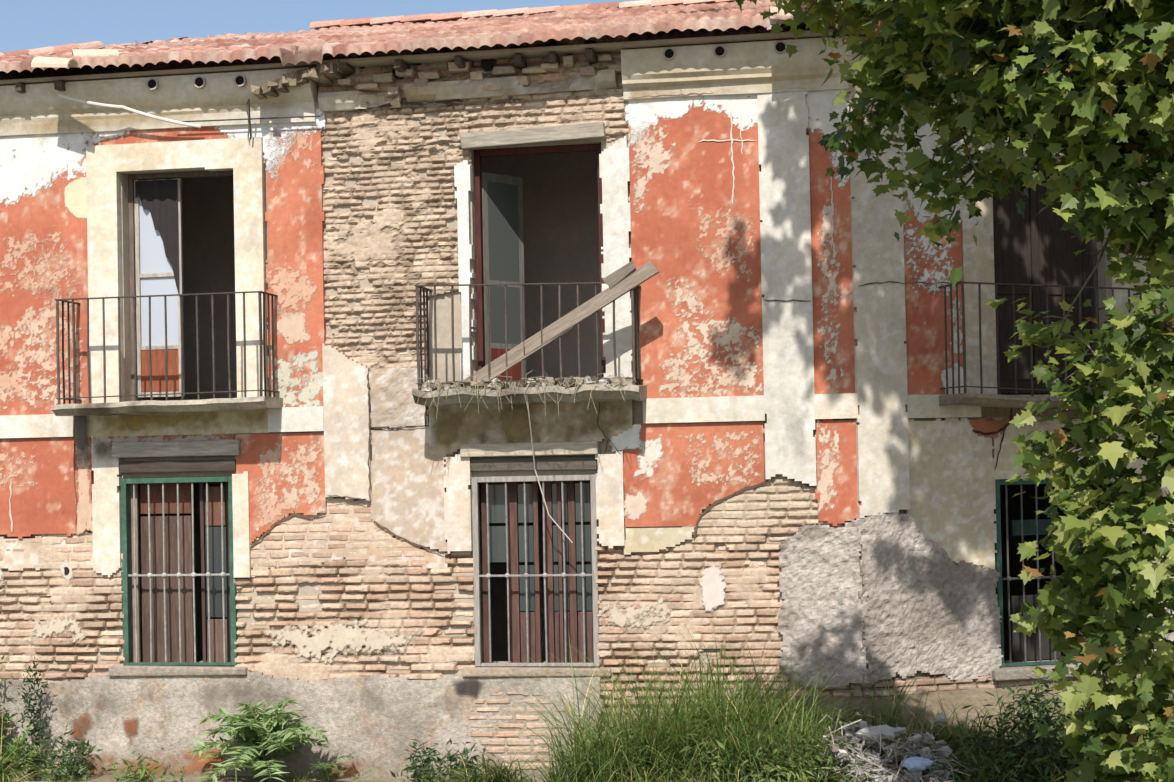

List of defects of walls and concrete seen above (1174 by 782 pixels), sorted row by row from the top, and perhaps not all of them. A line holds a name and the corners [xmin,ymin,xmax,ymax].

peeling [0,130,130,413]
spalling [215,35,763,407]
peeling [806,89,853,187]
peeling [816,202,844,381]
peeling [901,96,964,394]
spalling [970,417,1010,439]
spalling [0,444,125,684]
spalling [233,440,476,683]
spalling [595,420,854,727]